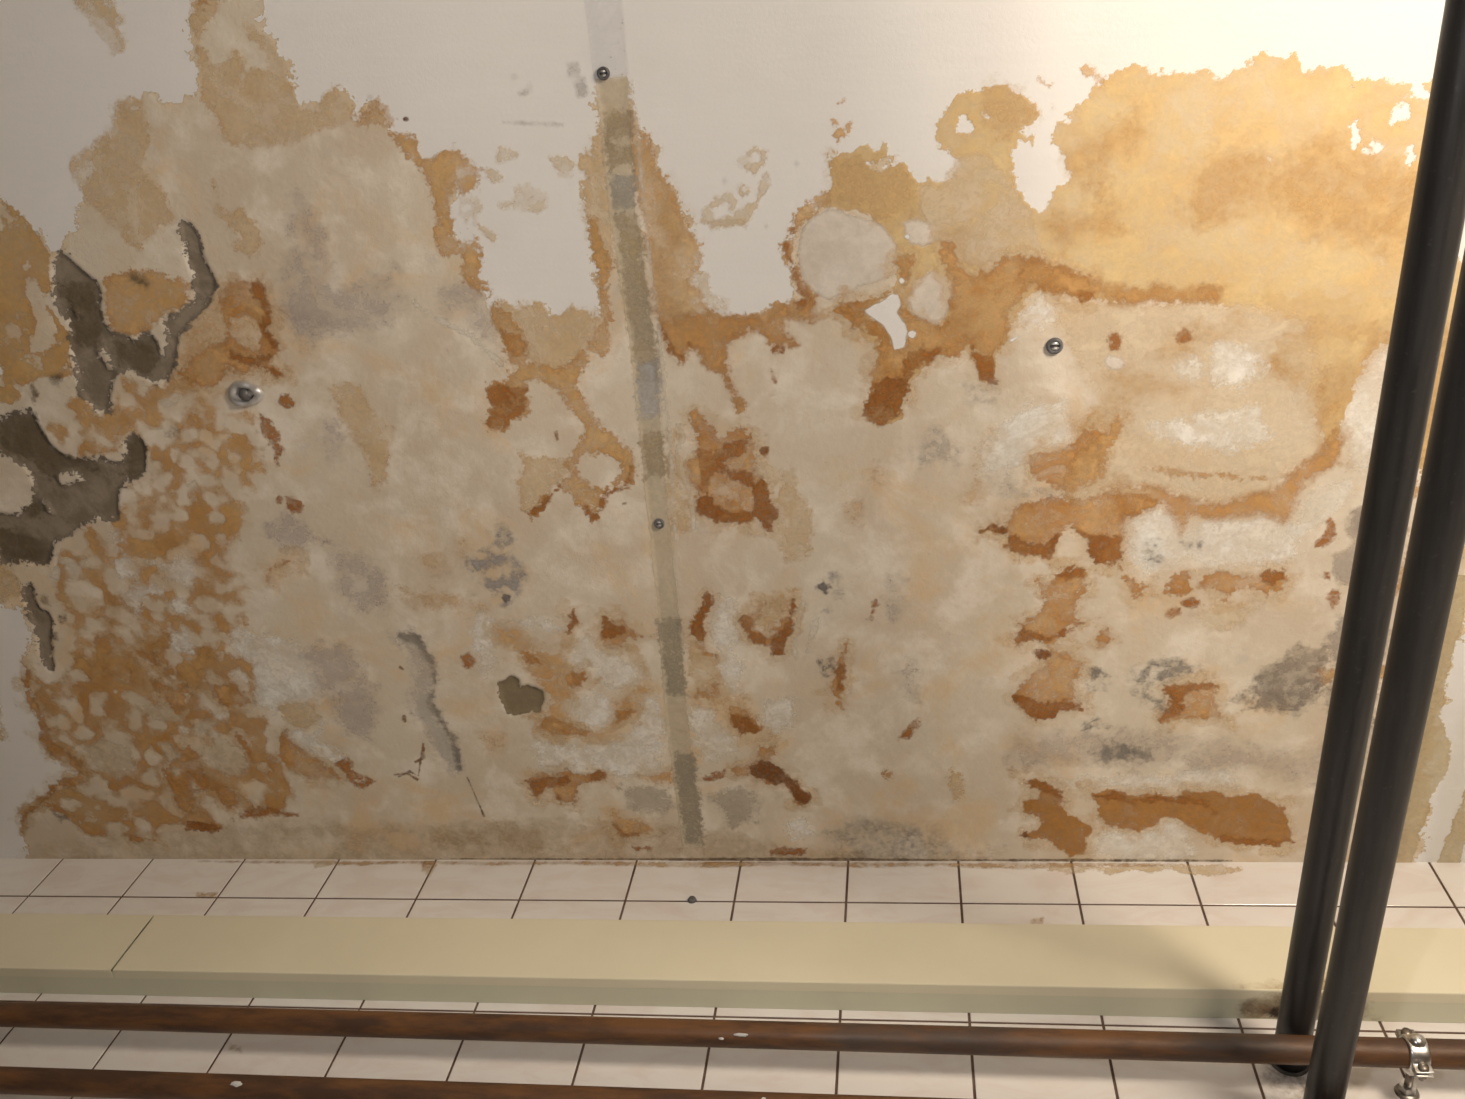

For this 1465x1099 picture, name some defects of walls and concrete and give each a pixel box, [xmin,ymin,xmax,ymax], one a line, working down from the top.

damp [0,205,71,404]
damp [103,269,189,335]
damp [19,281,373,843]
damp [388,121,635,522]
damp [469,528,671,810]
peeling [0,0,1370,862]
damp [631,51,1432,584]
damp [1242,618,1343,711]
peeling [1351,340,1389,408]
peeling [1346,458,1422,862]
damp [1396,575,1465,863]
damp [1419,258,1462,474]